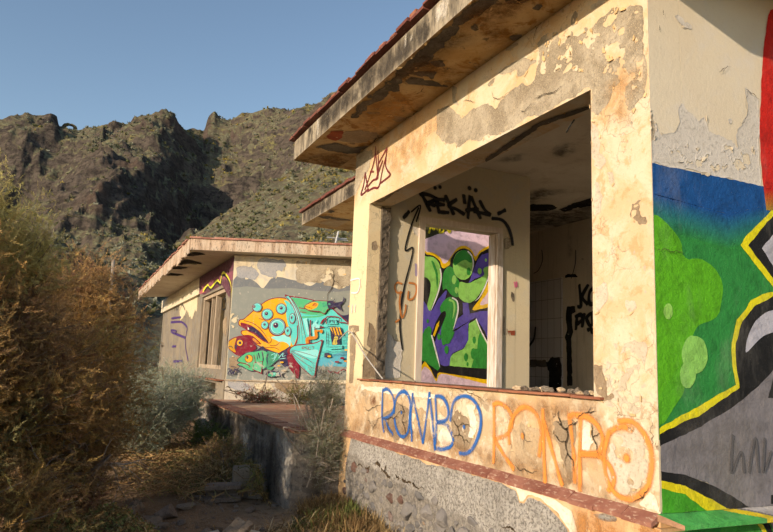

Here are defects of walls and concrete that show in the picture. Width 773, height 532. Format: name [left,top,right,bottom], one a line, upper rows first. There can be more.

water stain [308,22,429,136]
peeling [351,0,647,186]
peeling [650,88,761,186]
water stain [295,154,347,168]
peeling [530,182,603,216]
peeling [296,258,352,289]
peeling [593,282,608,315]
peeling [437,428,454,446]
peeling [458,404,477,438]
crack [556,409,599,467]
peeling [582,420,661,514]
peeling [510,486,590,532]